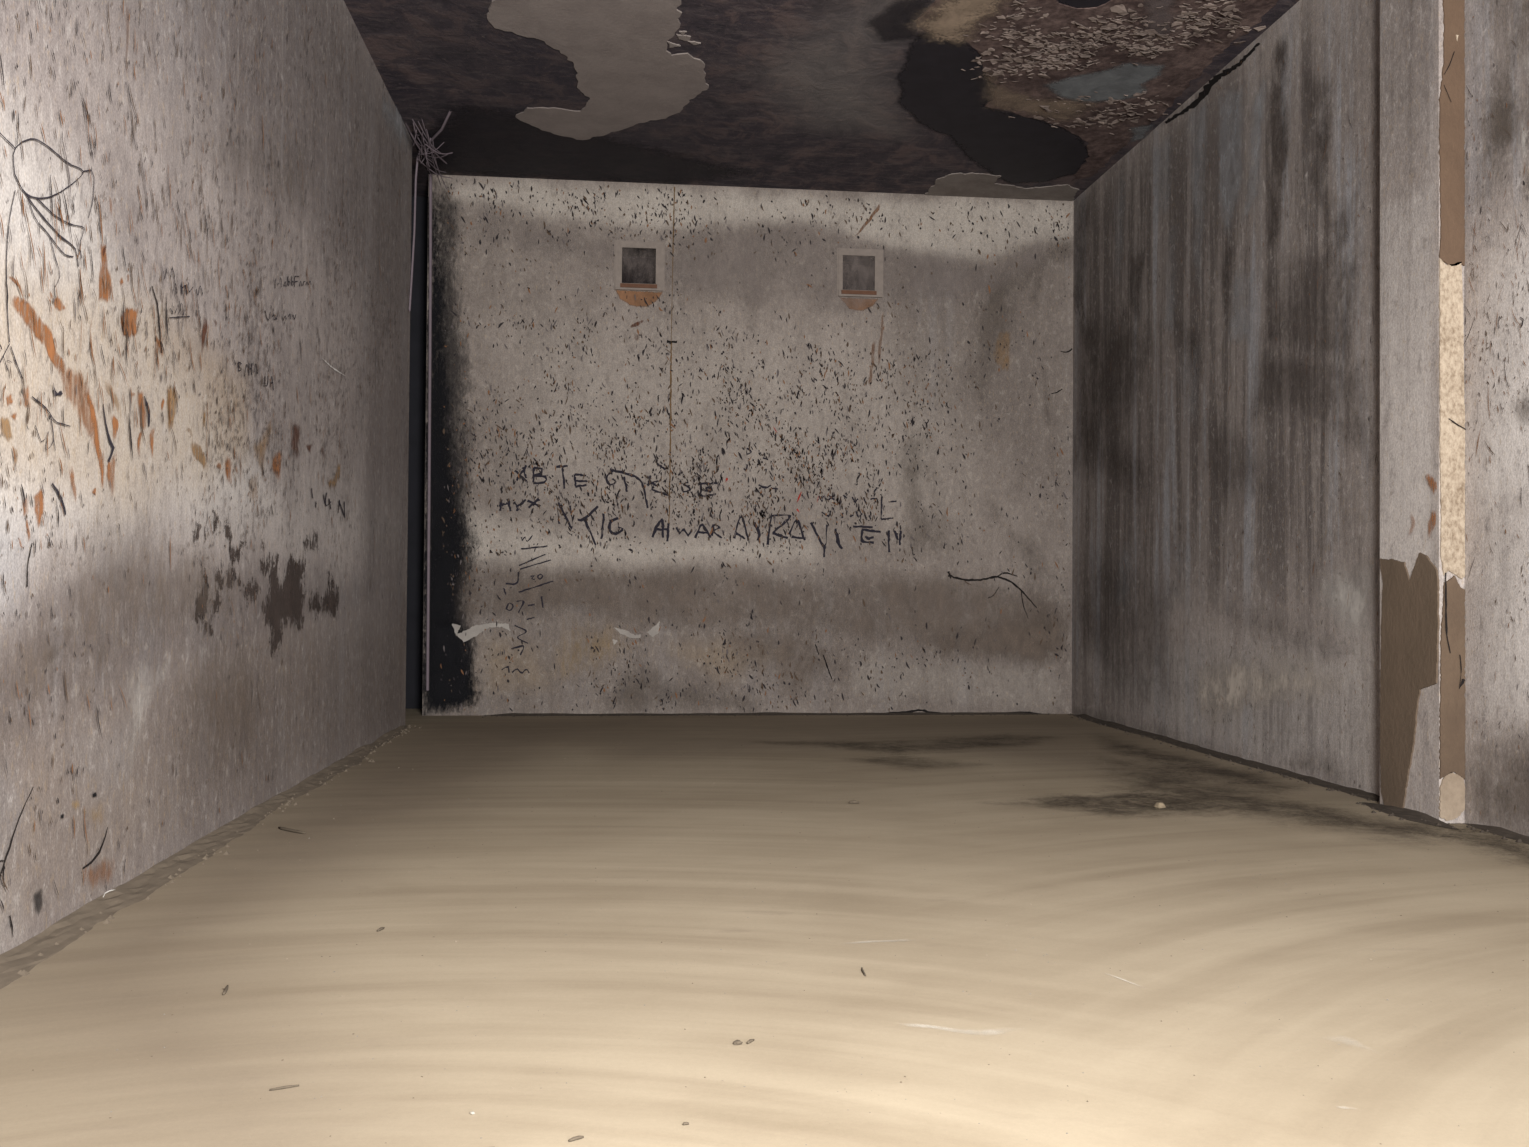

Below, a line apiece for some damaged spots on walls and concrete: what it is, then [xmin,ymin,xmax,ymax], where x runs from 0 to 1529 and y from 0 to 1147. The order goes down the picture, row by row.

water stain [414,106,743,184]
peeling [487,0,709,140]
peeling [915,0,1278,201]
corrosion [99,246,129,302]
corrosion [1,387,28,463]
corrosion [20,490,43,546]
corrosion [10,277,231,496]
corrosion [256,426,323,475]
water stain [423,195,475,715]
peeling [1380,0,1466,821]